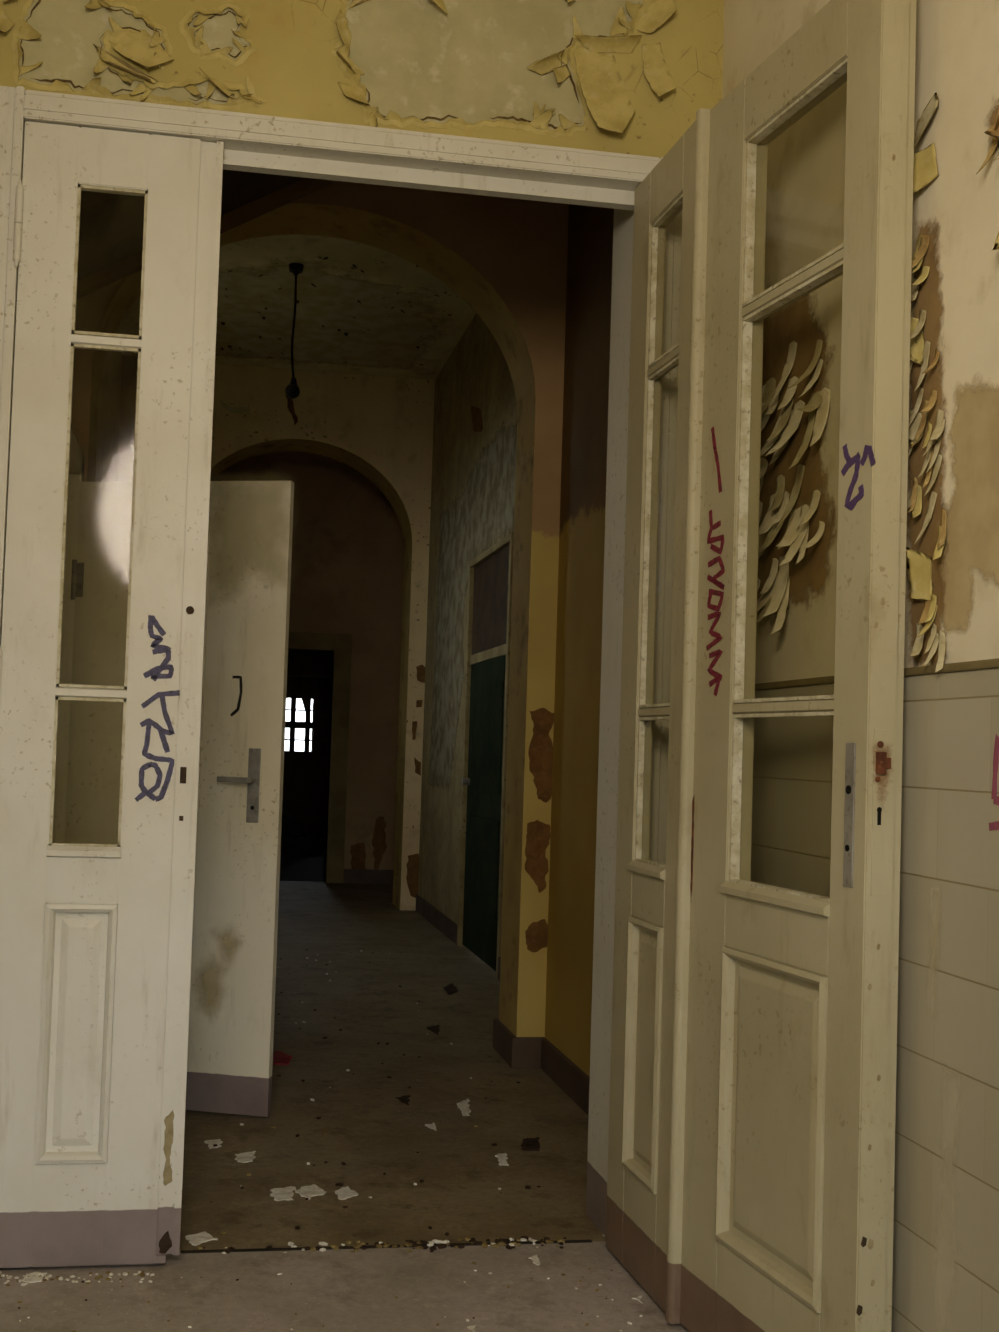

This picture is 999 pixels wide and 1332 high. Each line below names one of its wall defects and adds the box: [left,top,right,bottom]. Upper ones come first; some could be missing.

peeling [0,0,268,111]
peeling [331,0,676,138]
peeling [913,92,939,193]
peeling [976,101,999,174]
peeling [906,222,947,673]
spalling [528,708,554,803]
spalling [524,820,551,893]
spalling [525,919,548,953]